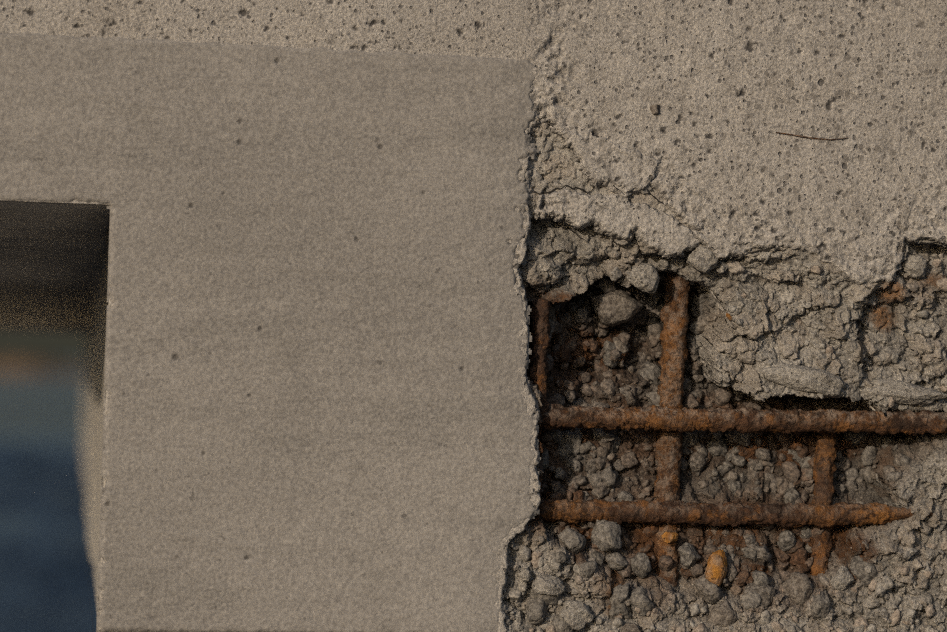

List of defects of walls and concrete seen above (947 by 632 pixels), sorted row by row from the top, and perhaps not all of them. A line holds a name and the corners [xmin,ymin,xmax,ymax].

spalling [502,116,947,632]
rust [531,477,551,521]
rust [563,523,593,539]
rust [704,524,761,551]
rust [831,525,876,580]